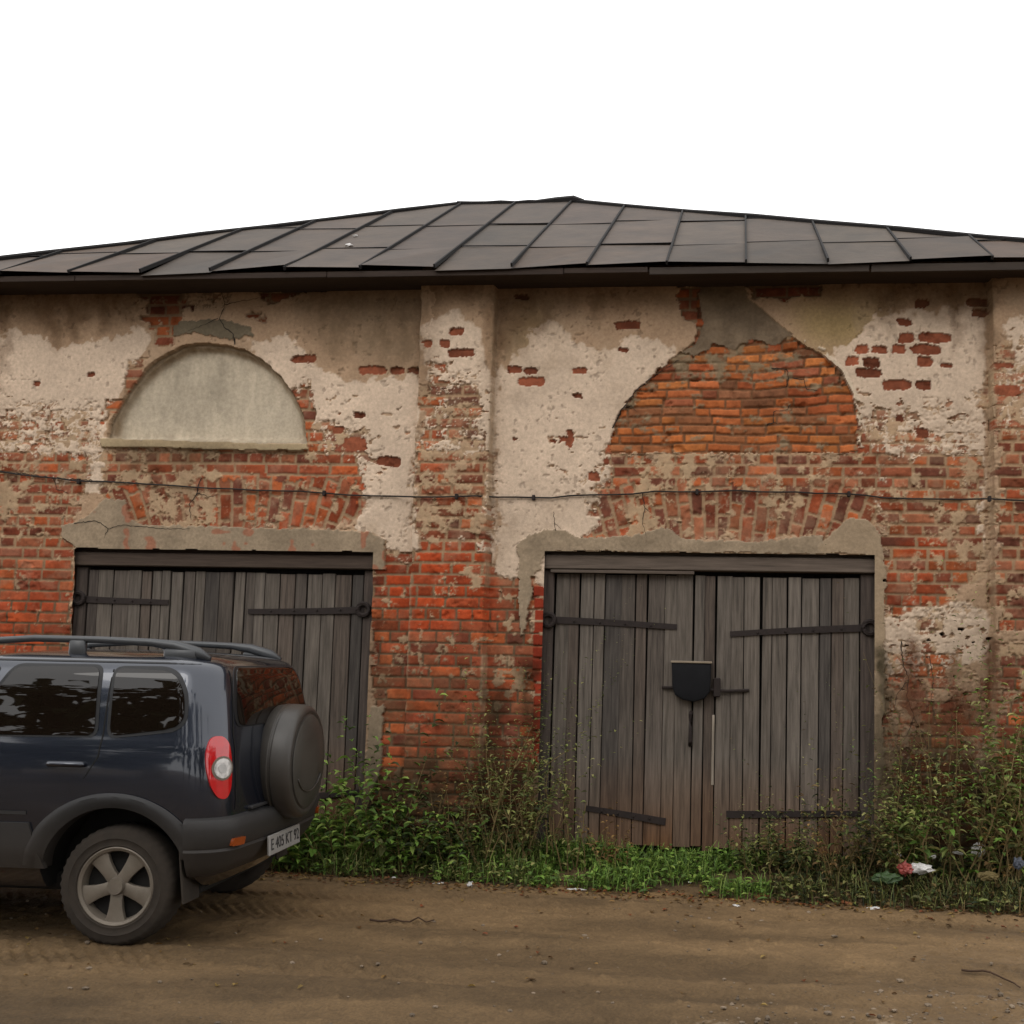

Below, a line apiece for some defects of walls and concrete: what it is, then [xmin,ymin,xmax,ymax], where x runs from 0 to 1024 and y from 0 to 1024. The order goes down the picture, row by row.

spalling [135,293,198,347]
crack [189,292,265,345]
spalling [675,287,701,323]
spalling [746,285,823,302]
spalling [291,354,317,363]
spalling [550,429,575,453]
crack [74,478,215,538]
spalling [0,357,401,653]
spalling [359,326,545,850]
spalling [576,297,1024,865]